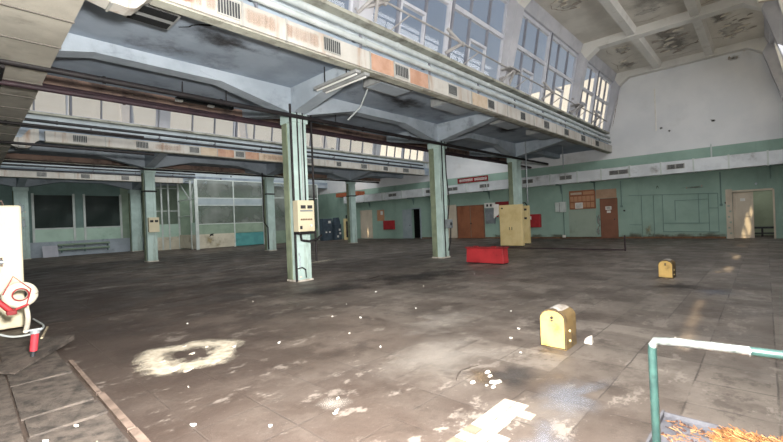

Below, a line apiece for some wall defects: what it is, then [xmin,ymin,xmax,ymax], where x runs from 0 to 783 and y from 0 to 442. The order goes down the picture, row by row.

peeling [652,28,699,57]